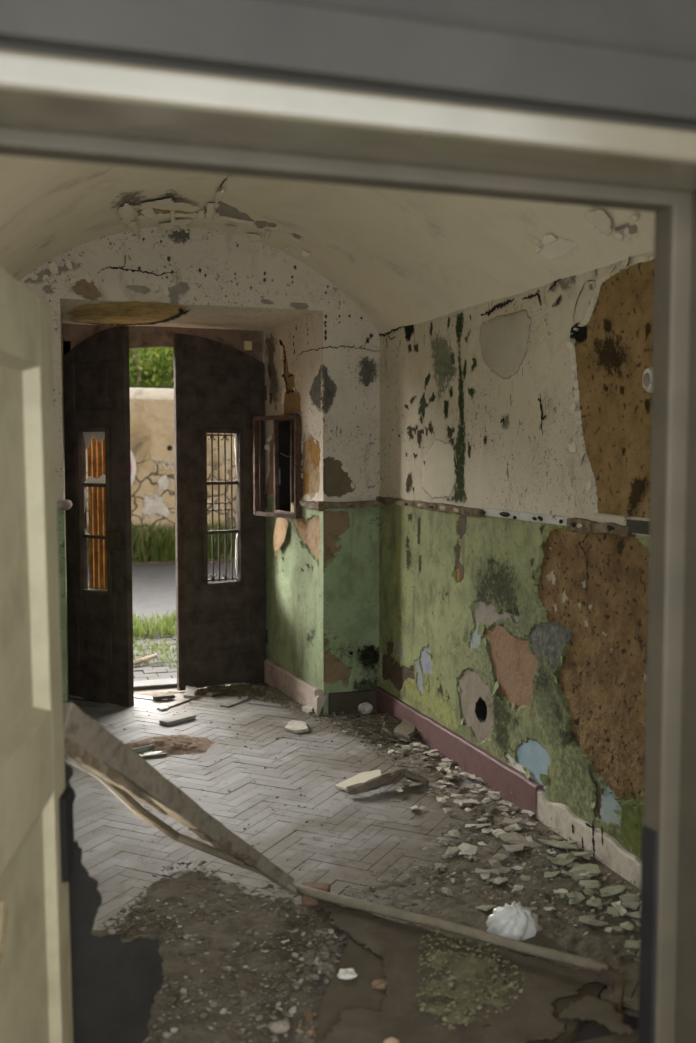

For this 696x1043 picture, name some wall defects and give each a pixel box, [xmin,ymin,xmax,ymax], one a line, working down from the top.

peeling [116,198,277,243]
crack [98,266,172,276]
crack [279,325,415,394]
spalling [301,433,356,499]
spalling [273,510,350,572]
spalling [382,256,654,827]
water stain [329,640,379,691]
peeling [377,719,640,955]